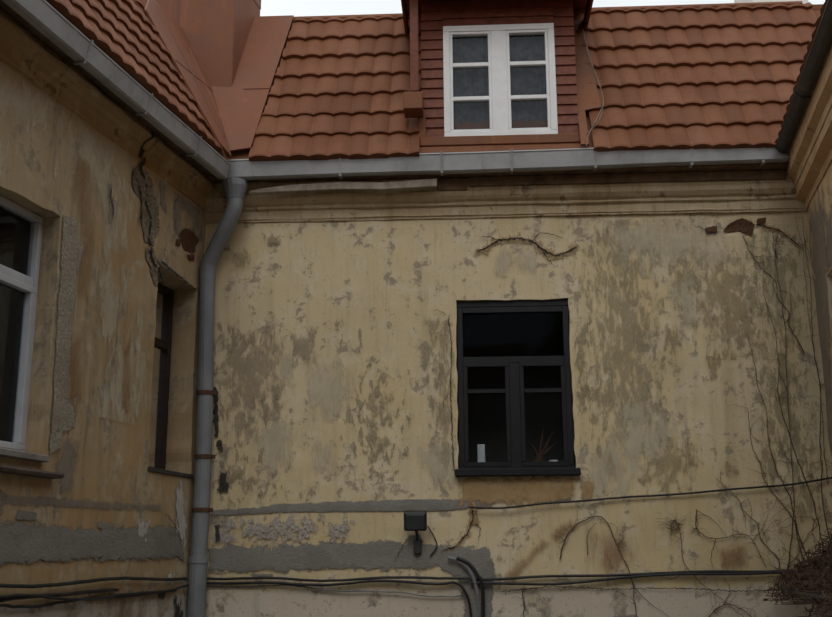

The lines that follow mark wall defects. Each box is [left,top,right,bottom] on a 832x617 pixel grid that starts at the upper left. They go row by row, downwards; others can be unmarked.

crack [108,183,118,222]
crack [135,131,195,289]
spalling [176,228,199,261]
crack [473,232,580,264]
peeling [210,321,355,549]
peeling [336,357,410,489]
peeling [419,313,455,486]
peeling [575,229,698,497]
peeling [668,217,828,522]
crack [442,500,481,553]